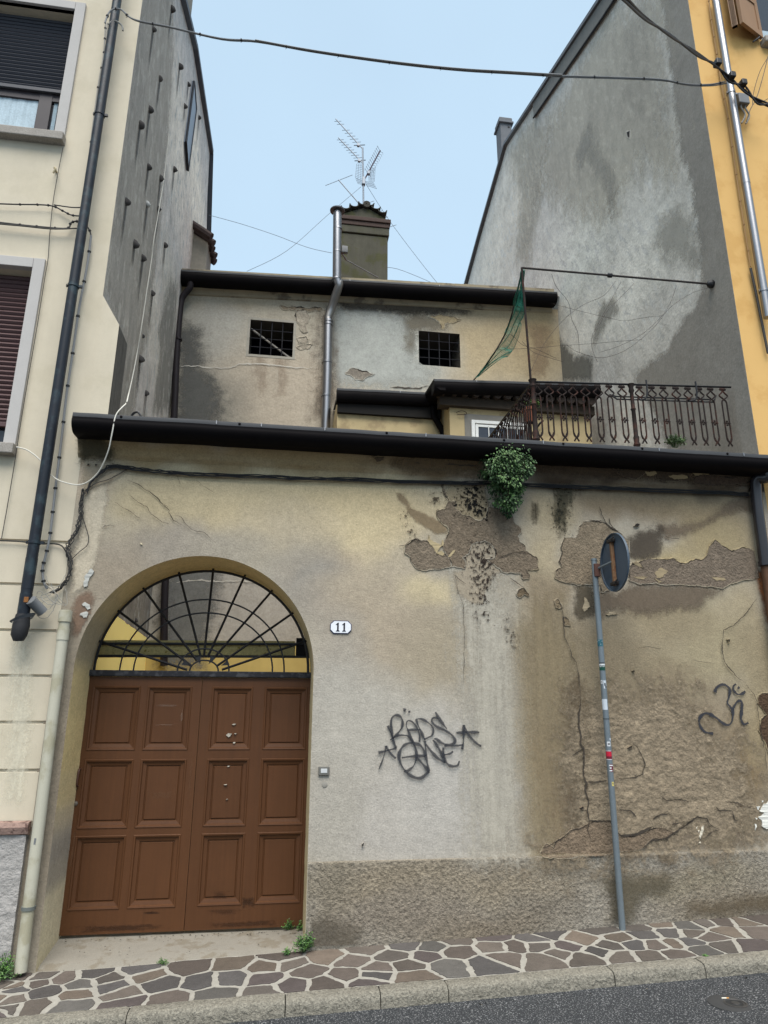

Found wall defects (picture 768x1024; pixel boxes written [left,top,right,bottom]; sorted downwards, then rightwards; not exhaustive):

water stain [103,0,223,421]
spalling [345,368,375,381]
water stain [531,327,592,382]
water stain [593,300,618,343]
crack [102,480,211,539]
spalling [404,484,539,599]
water stain [524,464,623,537]
spalling [554,520,759,612]
crack [695,601,767,766]
crack [543,598,751,848]
spalling [757,692,768,754]
peeling [754,800,768,830]